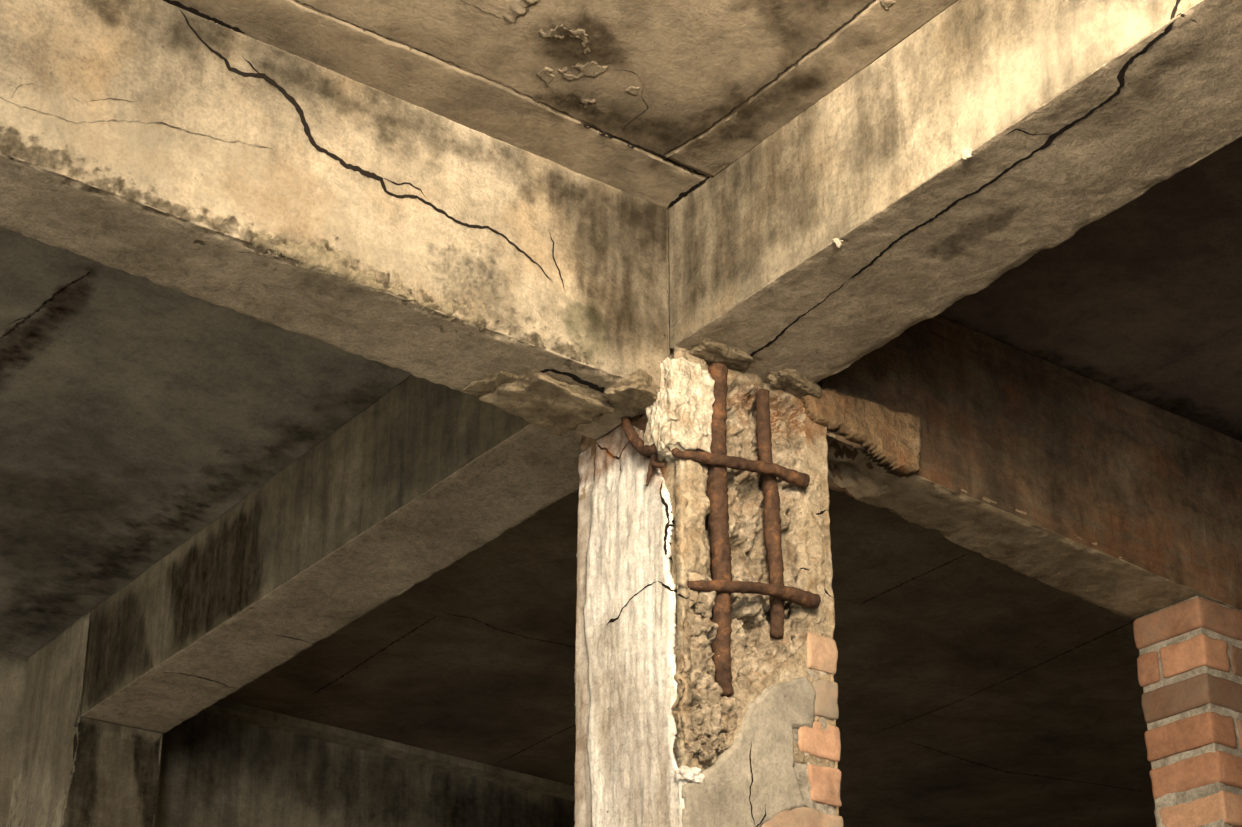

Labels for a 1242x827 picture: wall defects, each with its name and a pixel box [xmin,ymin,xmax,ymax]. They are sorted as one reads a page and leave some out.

leakage [546,15,616,64]
crack [0,85,272,149]
crack [181,11,565,290]
crack [750,0,1197,357]
crack [2,272,90,339]
leakage [0,273,92,369]
crack [607,480,705,624]
spalling [671,338,844,827]